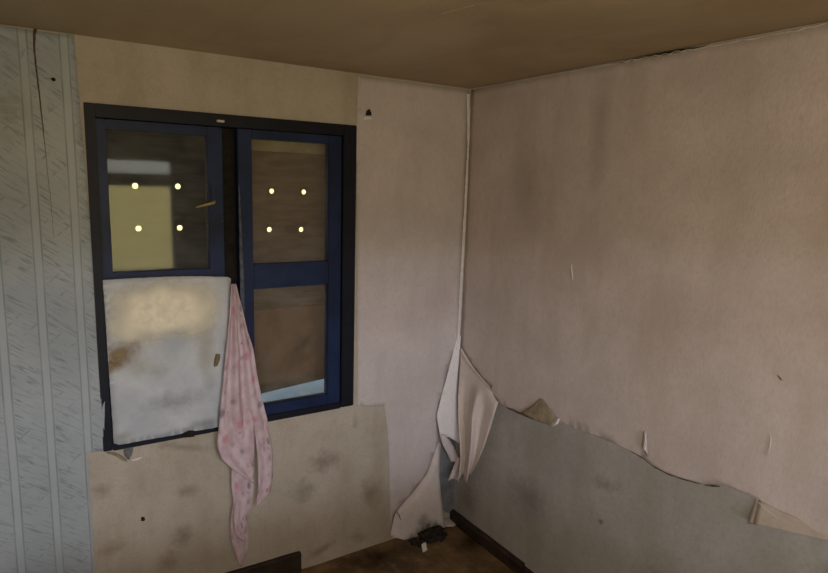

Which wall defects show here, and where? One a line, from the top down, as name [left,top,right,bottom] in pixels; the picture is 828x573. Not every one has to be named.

crack [33,28,54,235]
peeling [440,402,828,573]